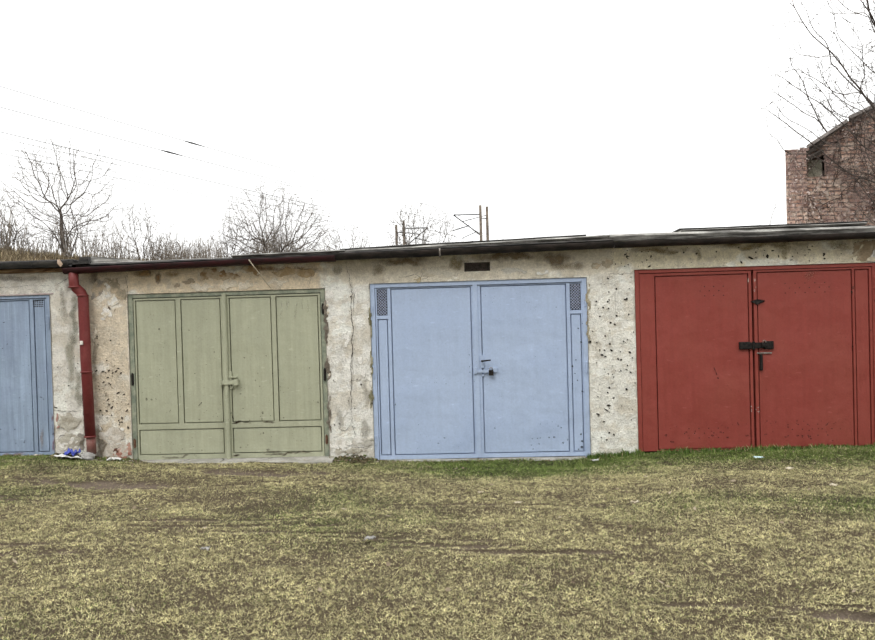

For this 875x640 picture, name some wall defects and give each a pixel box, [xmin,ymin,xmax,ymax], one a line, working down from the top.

flaking render [91,278,127,345]
crack [337,262,366,449]
spalling [95,360,132,460]